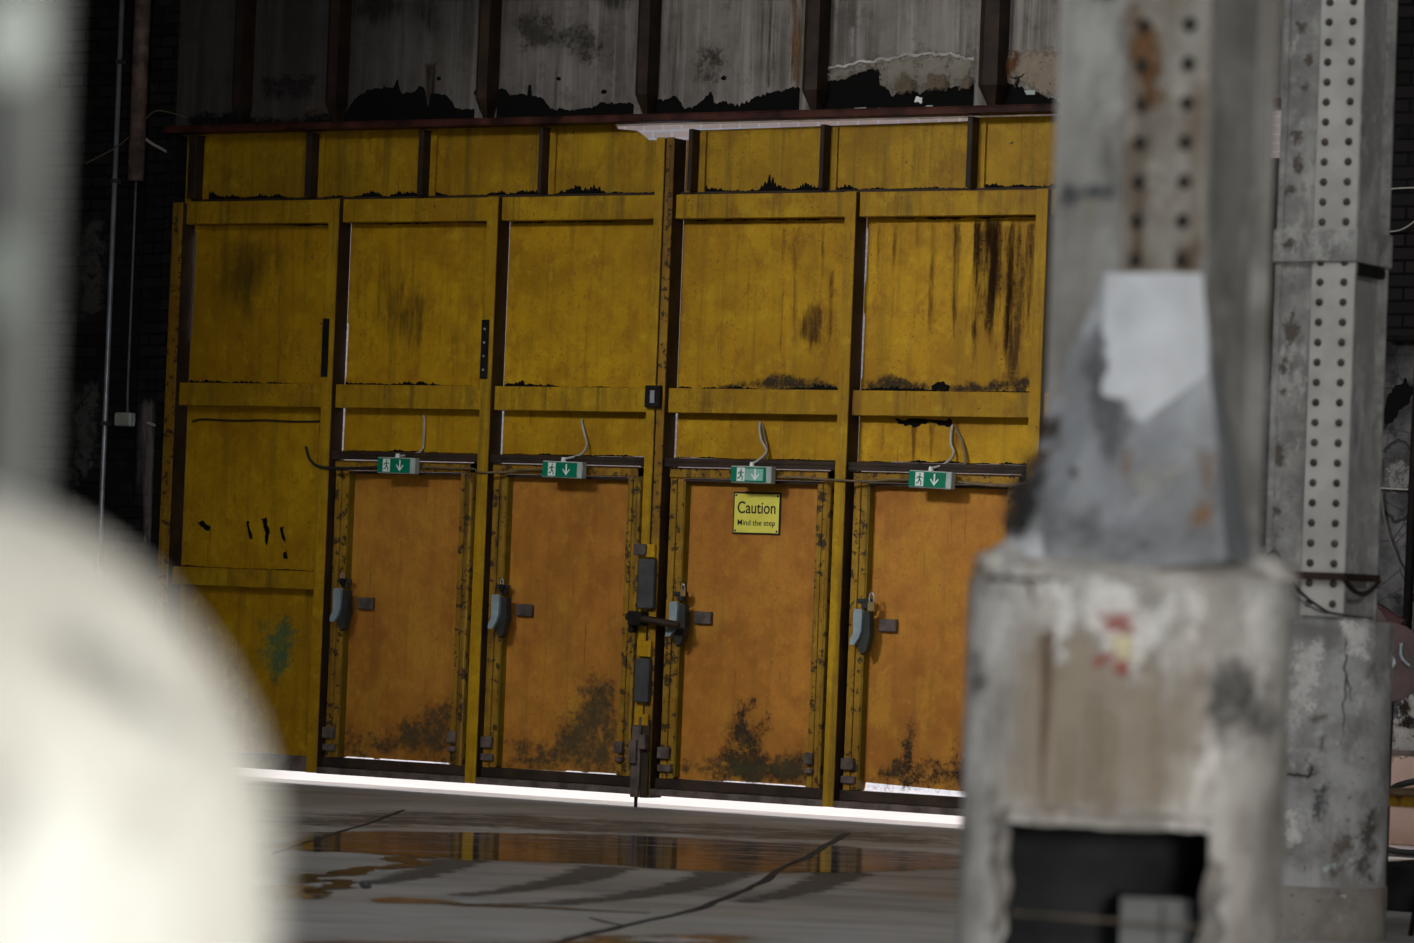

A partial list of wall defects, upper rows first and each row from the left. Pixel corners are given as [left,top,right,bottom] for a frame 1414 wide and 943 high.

leakage [518,16,602,64]
flaking render [823,68,974,109]
peeling [961,587,1015,798]
peeling [1049,574,1207,676]
peeling [1240,582,1327,721]
crack [1341,637,1352,744]
crack [1286,763,1318,778]
crack [275,810,446,896]
crack [441,833,850,943]